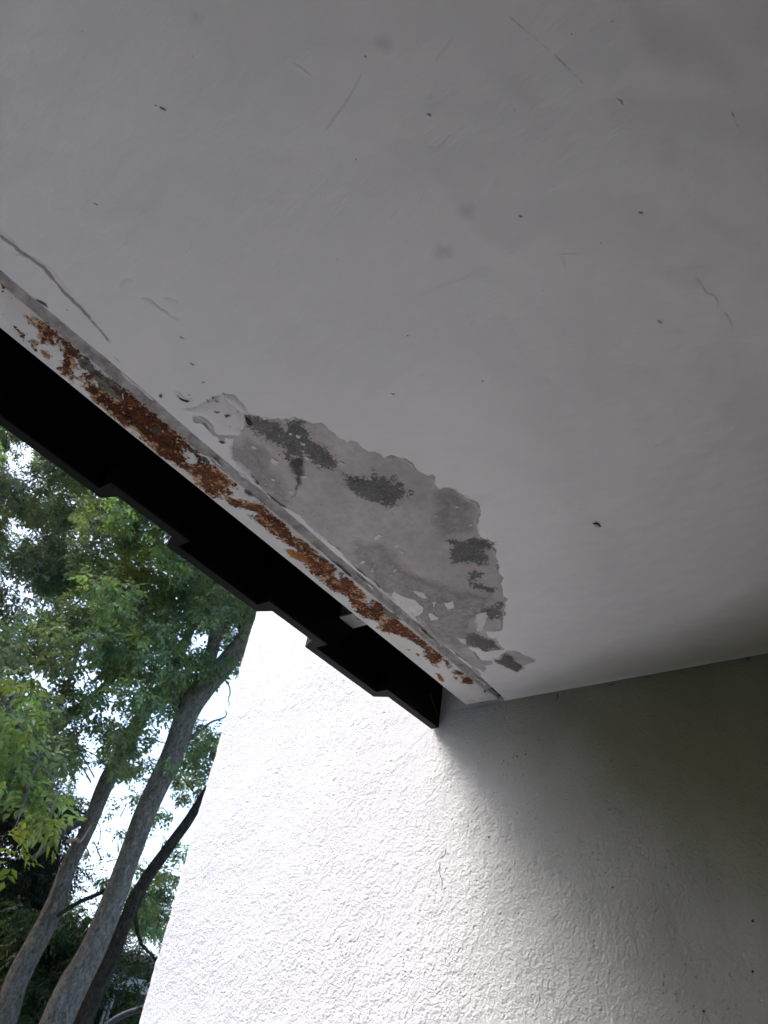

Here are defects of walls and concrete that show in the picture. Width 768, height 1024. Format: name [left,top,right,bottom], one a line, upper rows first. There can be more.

crack [0,232,112,343]
rust [14,316,473,684]
peeling [173,391,535,676]